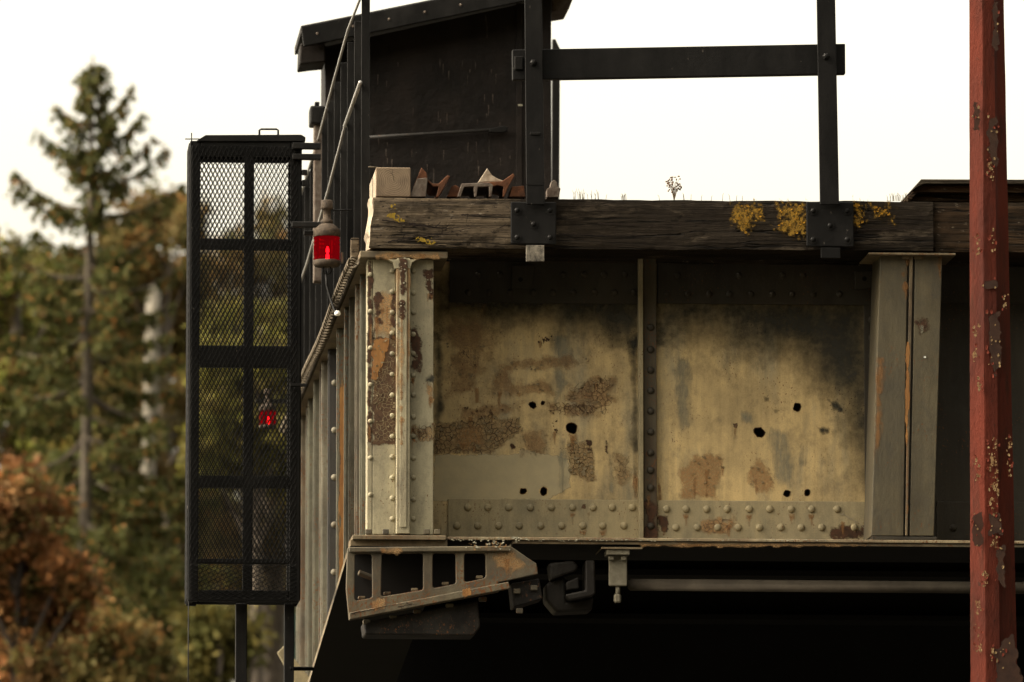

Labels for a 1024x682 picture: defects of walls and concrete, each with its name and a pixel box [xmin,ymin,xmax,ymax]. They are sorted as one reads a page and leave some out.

peeling [371,336,396,446]
peeling [412,357,612,455]
peeling [567,440,595,481]
leakage [659,304,864,448]
corrosion [675,517,864,548]
peeling [972,277,1009,391]
peeling [971,434,1014,588]
peeling [973,600,1023,682]